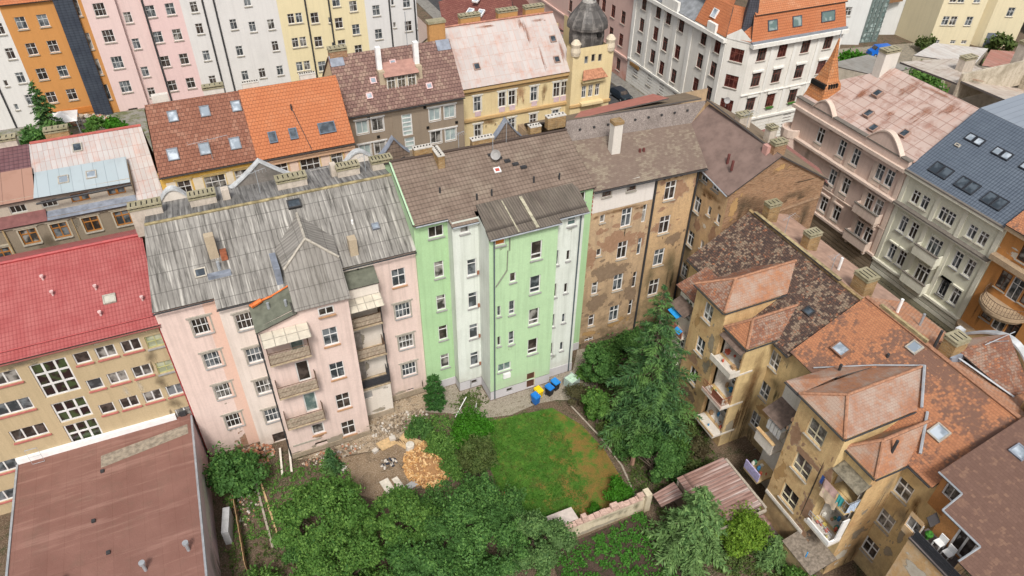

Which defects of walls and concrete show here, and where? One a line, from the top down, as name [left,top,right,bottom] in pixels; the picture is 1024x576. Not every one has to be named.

peeling [582,177,743,337]